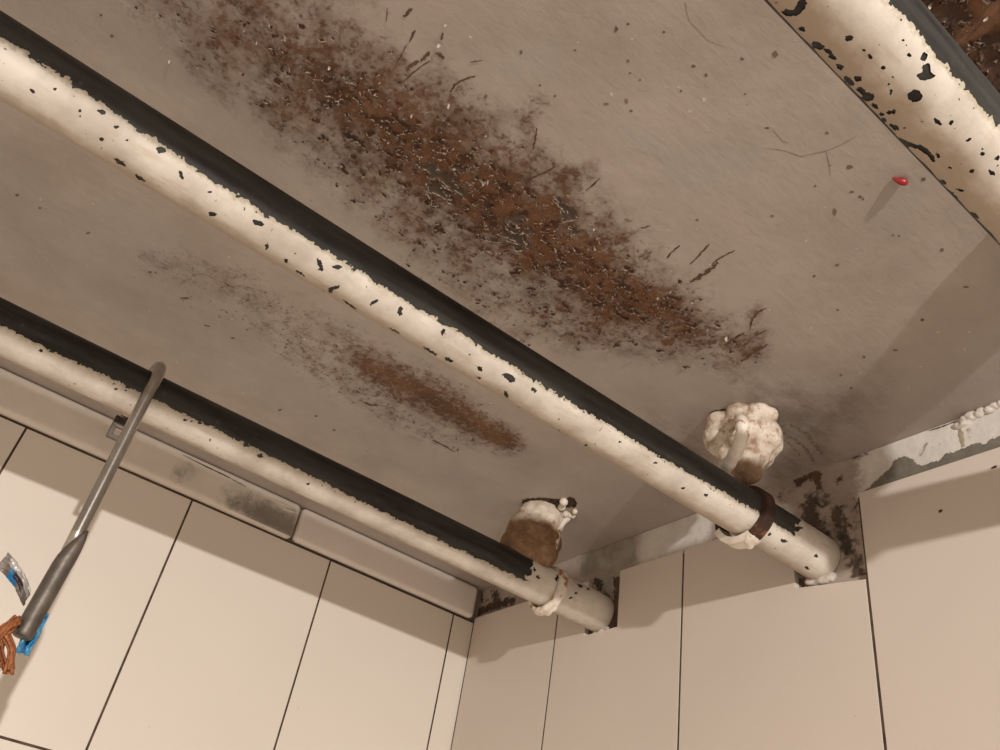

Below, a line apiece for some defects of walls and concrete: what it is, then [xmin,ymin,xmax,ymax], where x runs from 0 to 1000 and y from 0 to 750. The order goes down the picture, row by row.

rust [191,0,772,365]
rust [214,303,518,459]
water stain [800,493,866,578]
flaking render [865,436,1000,491]